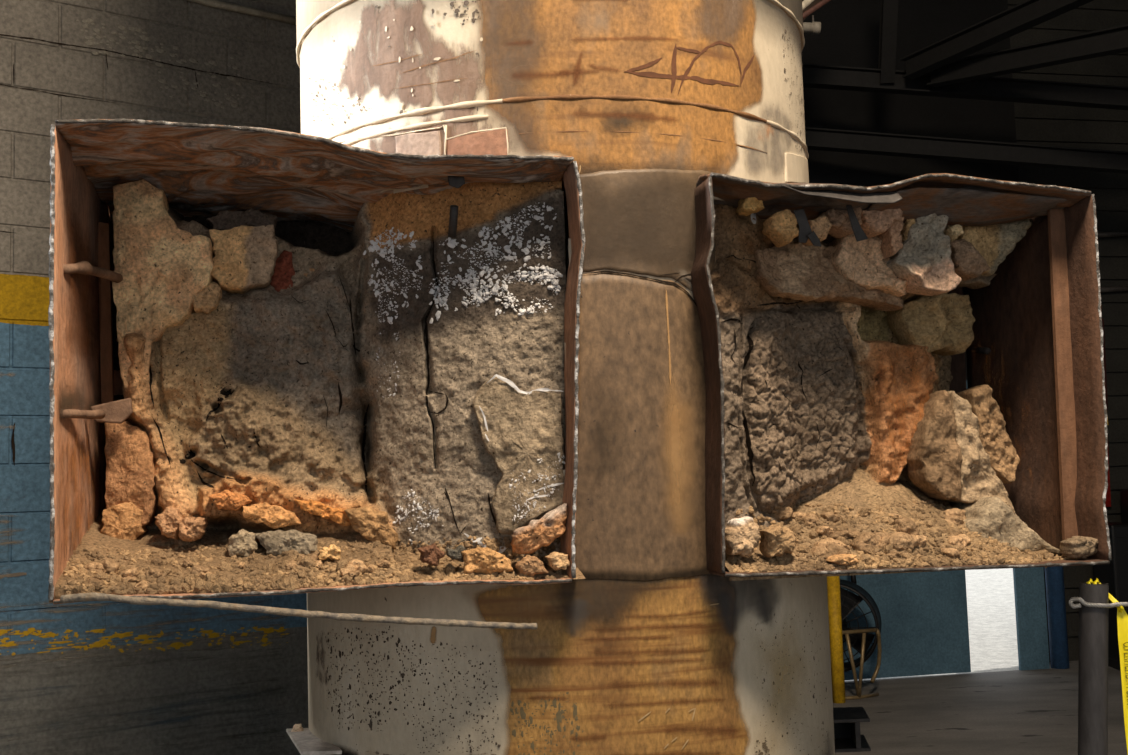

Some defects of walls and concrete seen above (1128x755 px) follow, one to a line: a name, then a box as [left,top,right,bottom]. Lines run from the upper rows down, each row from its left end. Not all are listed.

peeling [309,0,505,155]
corrosion [479,0,762,175]
spalling [100,502,208,542]
spalling [228,529,341,560]
crack [424,231,466,534]
water stain [363,202,563,406]
spalling [417,377,570,577]
crack [488,494,500,534]
crack [723,301,848,486]
spalling [736,197,996,356]
spalling [906,385,1020,515]
corrosion [476,575,749,755]